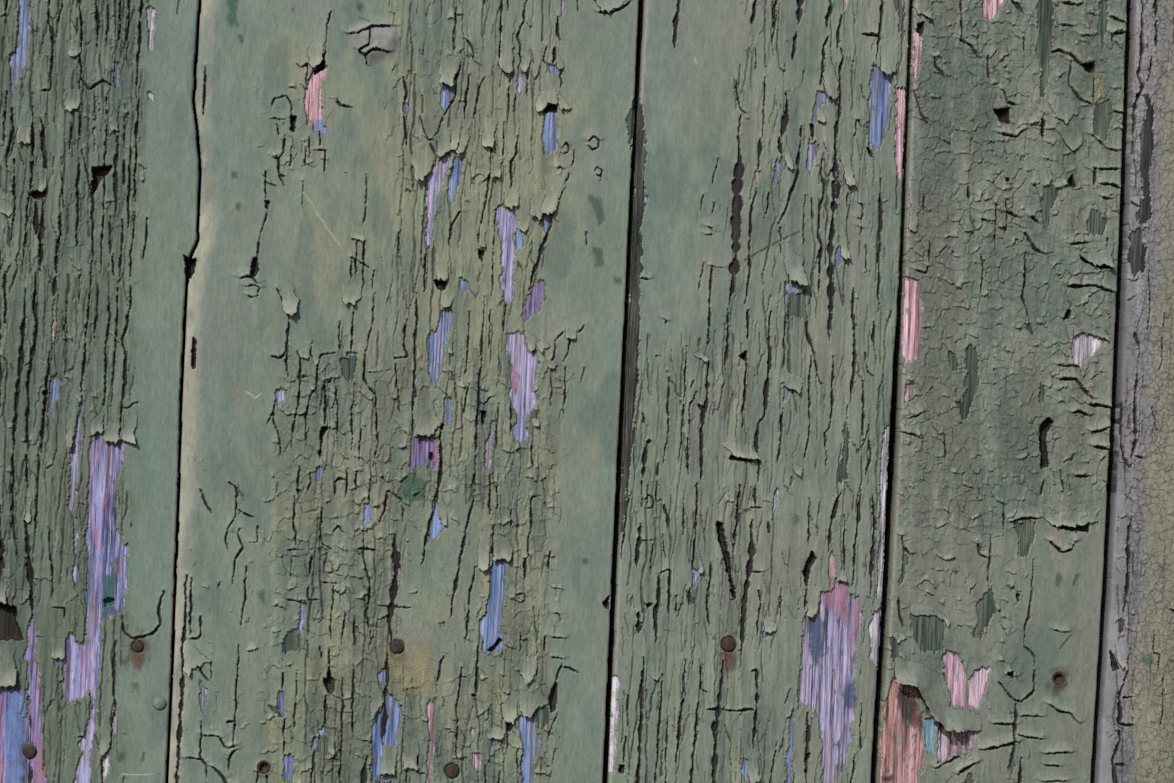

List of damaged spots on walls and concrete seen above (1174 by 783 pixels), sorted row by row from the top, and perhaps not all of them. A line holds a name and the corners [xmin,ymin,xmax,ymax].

crack [200,70,208,114]
peeling [867,0,933,232]
crack [257,0,602,783]
peeling [409,43,572,471]
crack [967,188,996,288]
crack [1020,255,1028,314]
peeling [0,374,138,783]
crack [101,483,258,783]
peeling [370,668,438,783]
peeling [477,532,513,654]
peeling [470,653,550,783]
peeling [784,426,990,783]